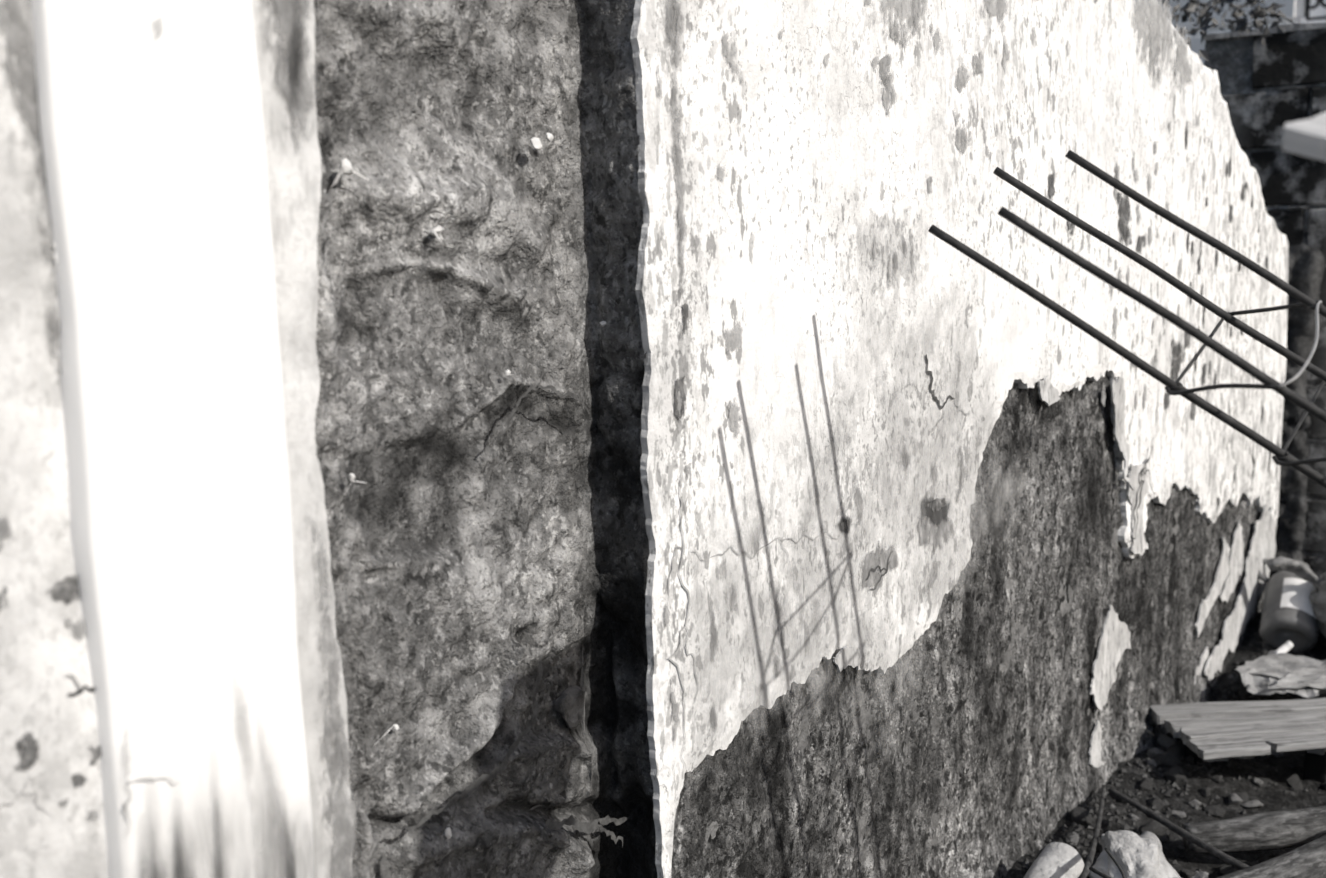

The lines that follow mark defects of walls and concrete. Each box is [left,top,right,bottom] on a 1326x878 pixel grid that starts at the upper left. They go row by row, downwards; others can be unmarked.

peeling [657,0,689,336]
peeling [726,324,743,358]
peeling [954,111,972,153]
peeling [1109,141,1169,333]
peeling [1153,232,1219,420]
peeling [1226,158,1253,222]
flaking render [671,352,1280,878]